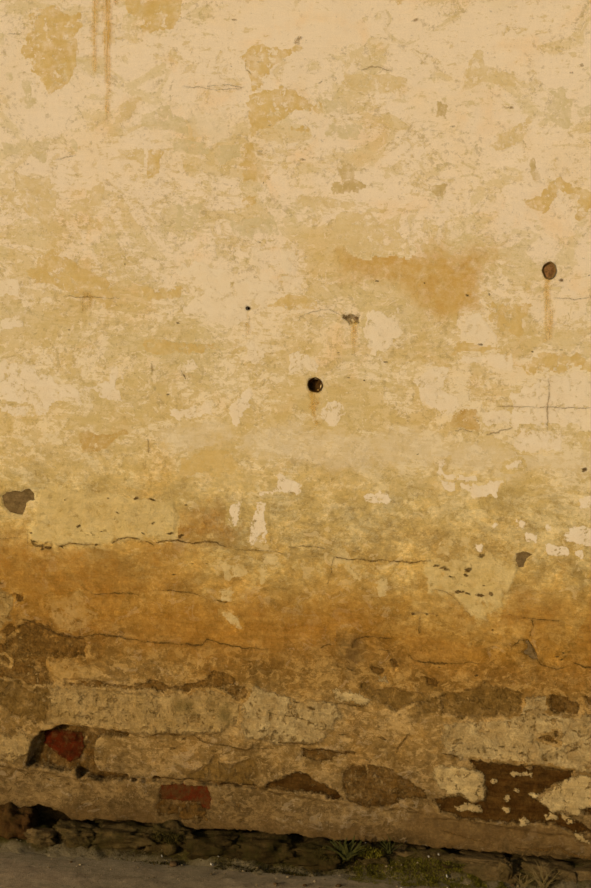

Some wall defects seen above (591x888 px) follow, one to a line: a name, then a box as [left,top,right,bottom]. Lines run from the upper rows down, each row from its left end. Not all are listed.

peeling [16,2,86,98]
peeling [233,40,333,213]
peeling [291,160,417,260]
peeling [165,242,406,359]
spalling [2,489,35,514]
crack [31,537,225,549]
peeling [146,293,591,633]
leakage [0,494,591,694]
spalling [0,588,251,785]
spalling [332,654,527,723]
spalling [536,693,591,747]
spalling [159,745,591,844]